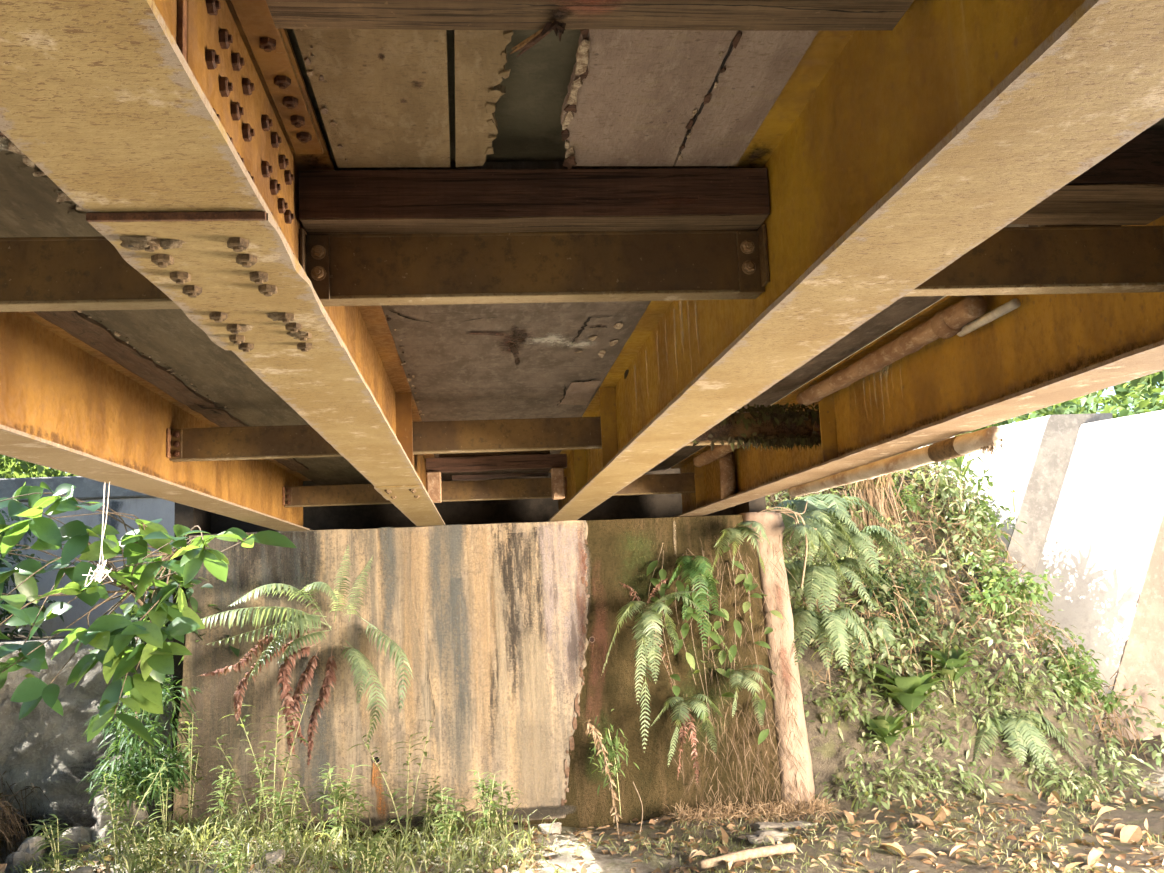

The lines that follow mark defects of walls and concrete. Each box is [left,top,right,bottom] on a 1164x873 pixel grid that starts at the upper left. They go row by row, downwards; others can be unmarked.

peeling [561,29,591,169]
crack [498,3,911,165]
spalling [557,378,601,406]
leakage [191,638,231,813]
leakage [246,522,587,832]